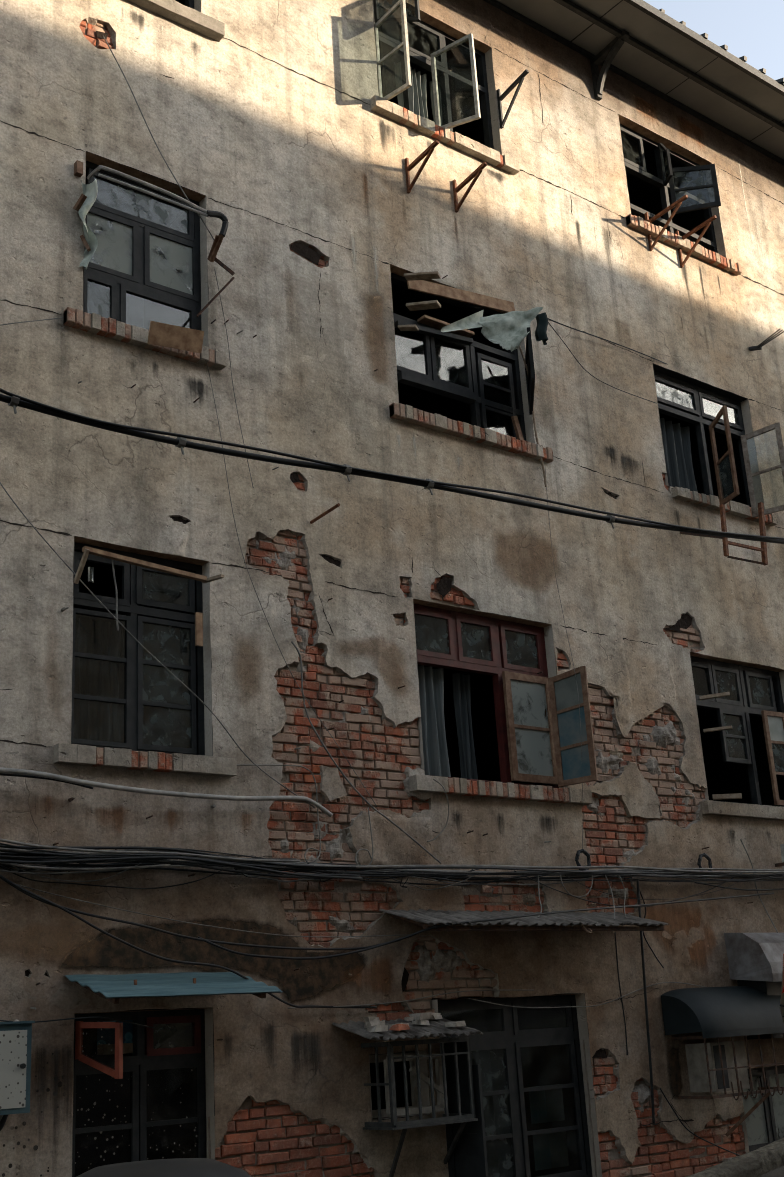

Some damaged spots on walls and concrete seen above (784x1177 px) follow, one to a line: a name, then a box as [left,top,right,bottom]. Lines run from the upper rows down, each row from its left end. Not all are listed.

crack [0,120,85,152]
flaking render [393,573,480,626]
flaking render [663,612,707,658]
flaking render [243,529,431,948]
flaking render [582,683,707,915]
flaking render [433,852,575,913]
flaking render [362,935,500,1022]
flaking render [208,1083,403,1177]
flaking render [583,1040,746,1177]